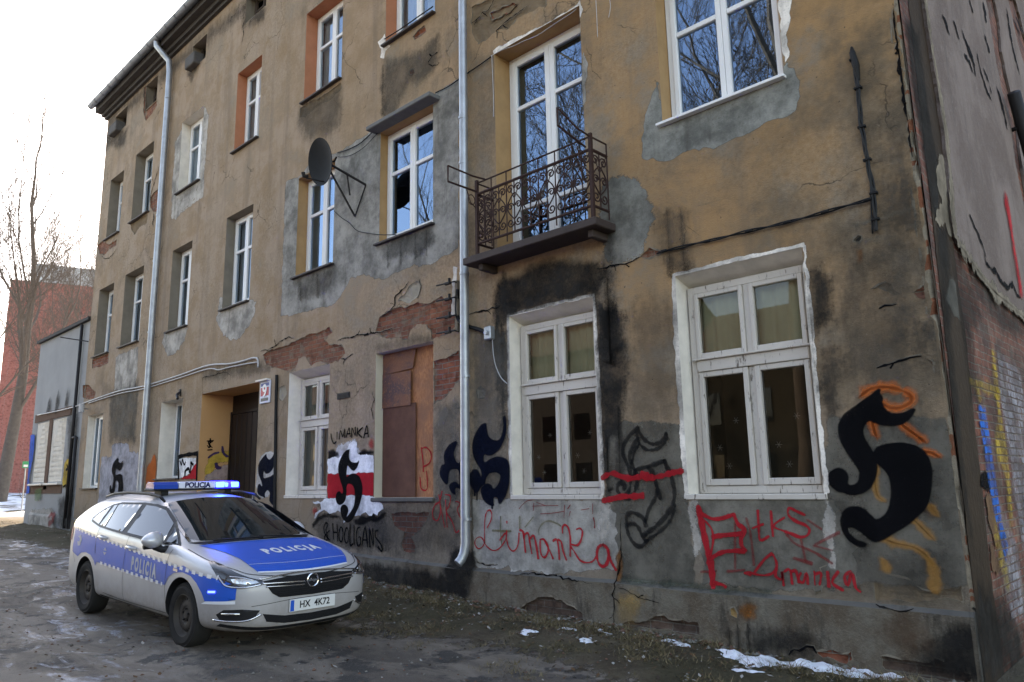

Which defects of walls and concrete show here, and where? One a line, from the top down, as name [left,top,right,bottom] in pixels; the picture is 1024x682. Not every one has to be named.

spalling [471,0,547,44]
water stain [384,39,437,116]
spalling [641,247,662,260]
crack [340,280,422,365]
spalling [375,280,455,340]
water stain [471,261,629,488]
spalling [520,595,584,620]
crack [475,521,658,623]